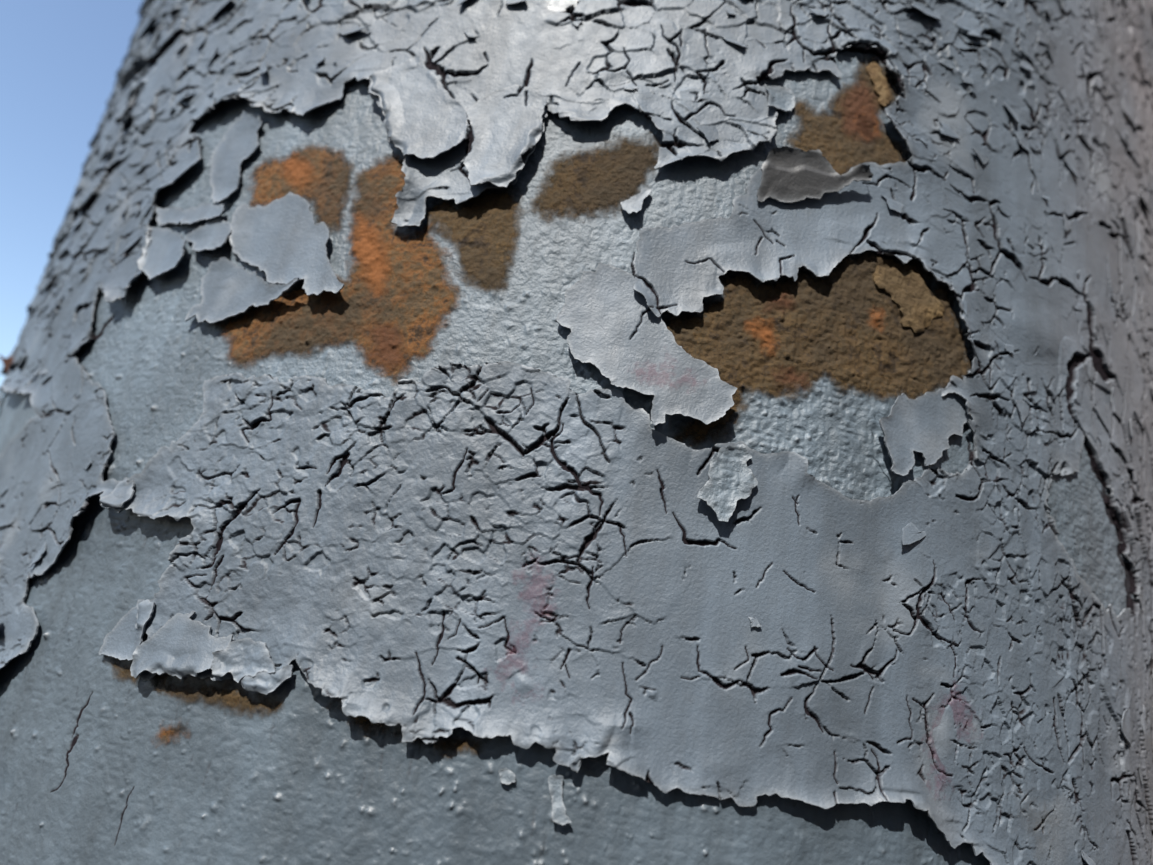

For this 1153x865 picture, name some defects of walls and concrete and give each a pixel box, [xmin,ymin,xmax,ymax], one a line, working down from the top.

crack [424,48,488,99]
peeling [545,0,583,27]
crack [608,0,939,144]
corrosion [787,57,907,175]
corrosion [220,132,661,381]
peeling [74,48,977,501]
corrosion [664,251,972,444]
crack [187,453,350,590]
peeling [697,444,758,522]
peeling [1026,436,1137,616]
peeling [0,466,990,865]
crack [756,562,981,801]